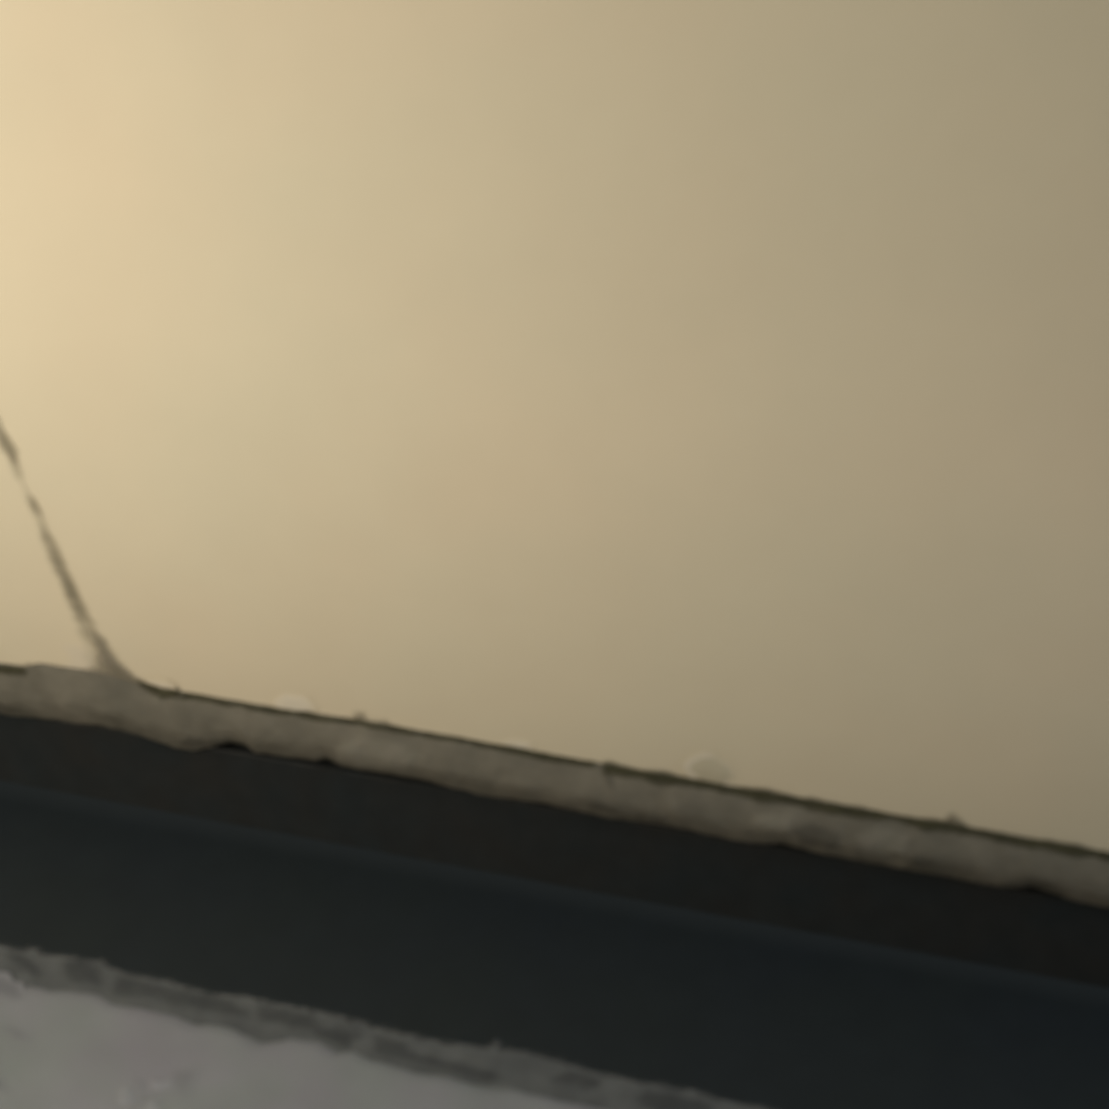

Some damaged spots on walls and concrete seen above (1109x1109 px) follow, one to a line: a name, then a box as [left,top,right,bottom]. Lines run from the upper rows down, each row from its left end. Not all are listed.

crack [0,422,1109,861]